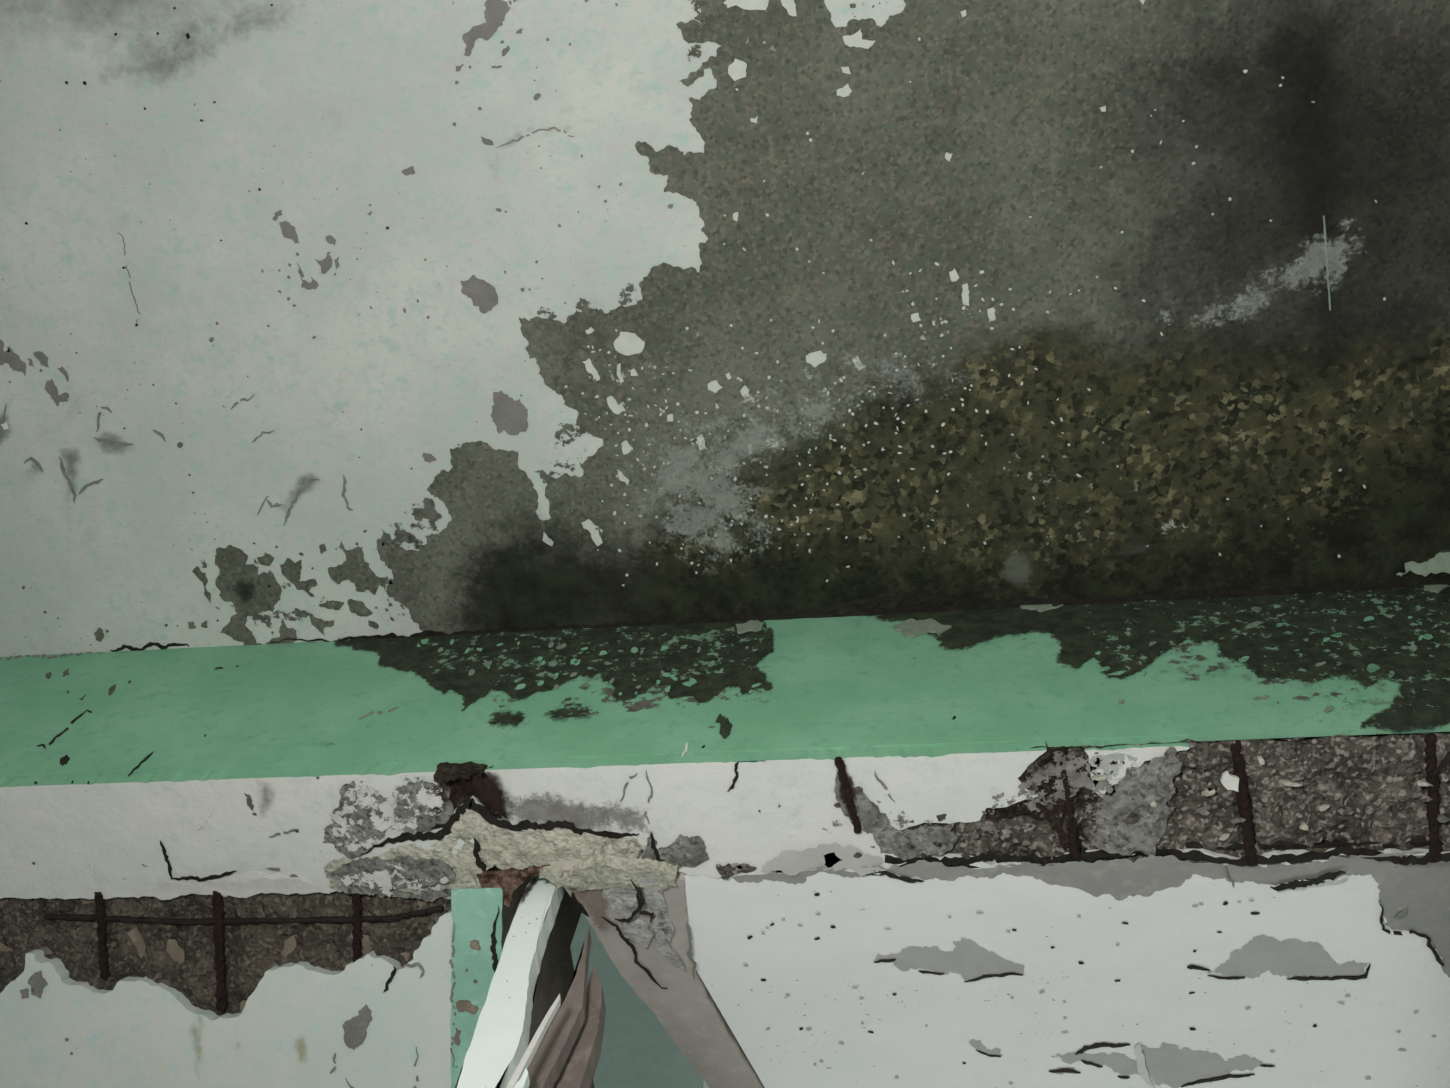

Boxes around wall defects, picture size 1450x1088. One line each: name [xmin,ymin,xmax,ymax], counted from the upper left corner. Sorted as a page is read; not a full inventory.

leakage [1190,24,1450,375]
peeling [188,0,1450,645]
peeling [0,340,69,406]
leakage [334,353,1450,733]
peeling [716,714,732,738]
corrosion [432,772,510,820]
crack [875,773,895,802]
corrosion [982,746,1183,856]
spalling [0,732,1450,1016]
crack [571,891,696,989]
peeling [963,1040,1003,1064]
peeling [1049,1042,1275,1088]